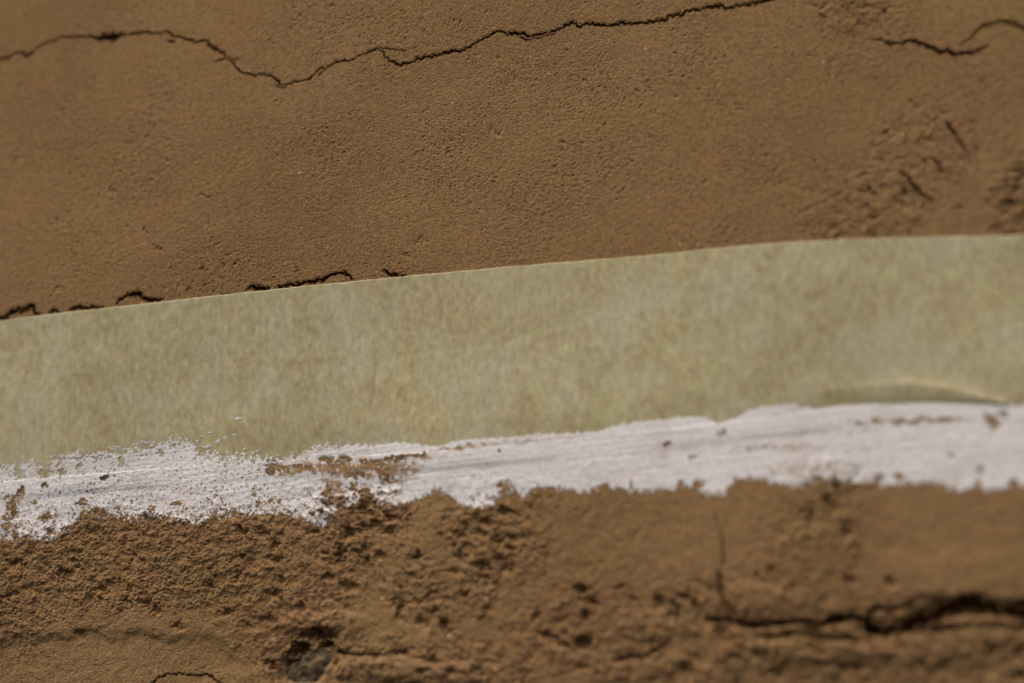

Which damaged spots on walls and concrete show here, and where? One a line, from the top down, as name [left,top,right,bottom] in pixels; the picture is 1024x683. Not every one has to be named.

crack [0,0,776,89]
crack [870,19,1024,58]
crack [246,269,355,291]
crack [382,268,407,277]
crack [0,289,164,321]
spalling [0,448,1024,683]
crack [706,513,1024,644]